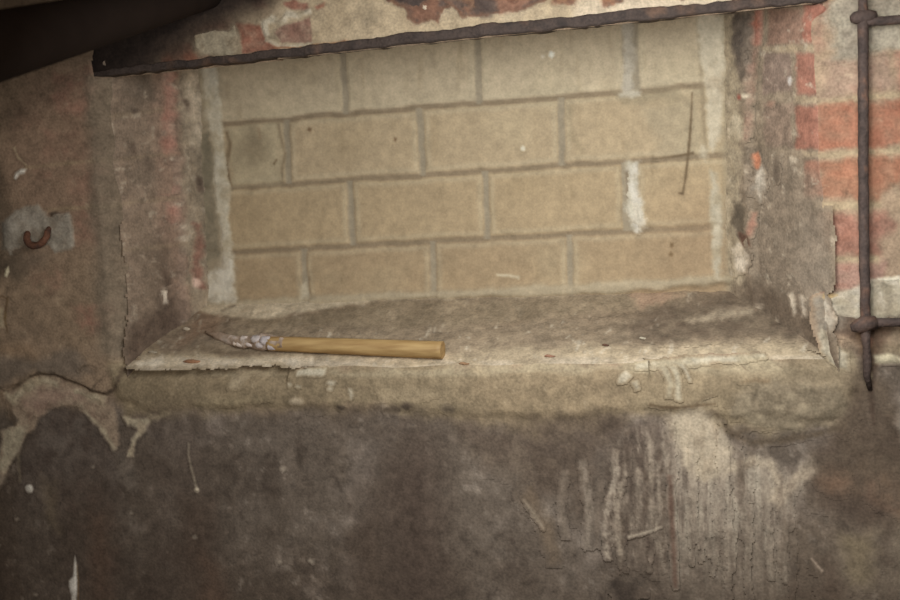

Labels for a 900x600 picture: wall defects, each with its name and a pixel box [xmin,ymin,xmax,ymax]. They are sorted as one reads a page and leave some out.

rust [383,0,579,27]
rust [598,0,625,10]
spalling [726,9,782,278]
damp [0,247,54,288]
rust [833,315,896,382]
crack [0,357,141,425]
damp [11,219,355,600]
damp [325,205,900,600]